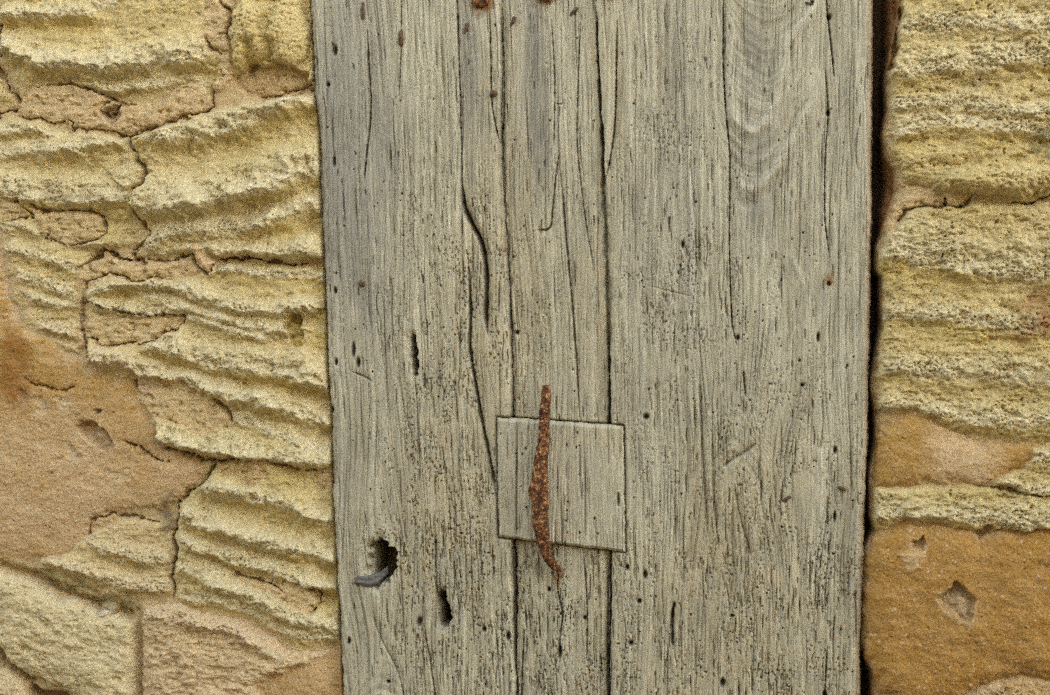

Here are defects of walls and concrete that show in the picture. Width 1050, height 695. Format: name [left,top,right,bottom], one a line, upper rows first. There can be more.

crack [205,1,233,55]
crack [261,80,316,99]
crack [0,26,304,358]
crack [898,197,972,222]
crack [26,378,75,393]
crack [214,399,233,422]
crack [88,441,318,596]
crack [233,568,323,613]